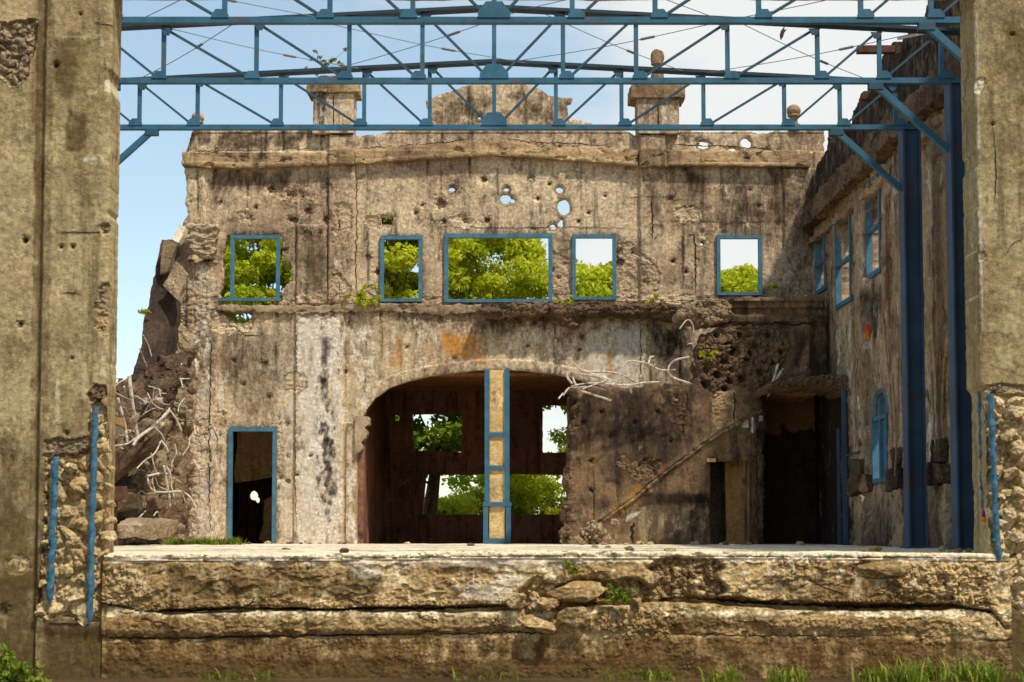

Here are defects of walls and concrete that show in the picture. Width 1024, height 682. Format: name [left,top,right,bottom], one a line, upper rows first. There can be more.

spalling [0,18,38,87]
spalling [36,376,227,627]
water stain [289,325,338,522]
spalling [558,296,849,544]
crack [697,434,988,609]
spalling [755,383,1024,635]